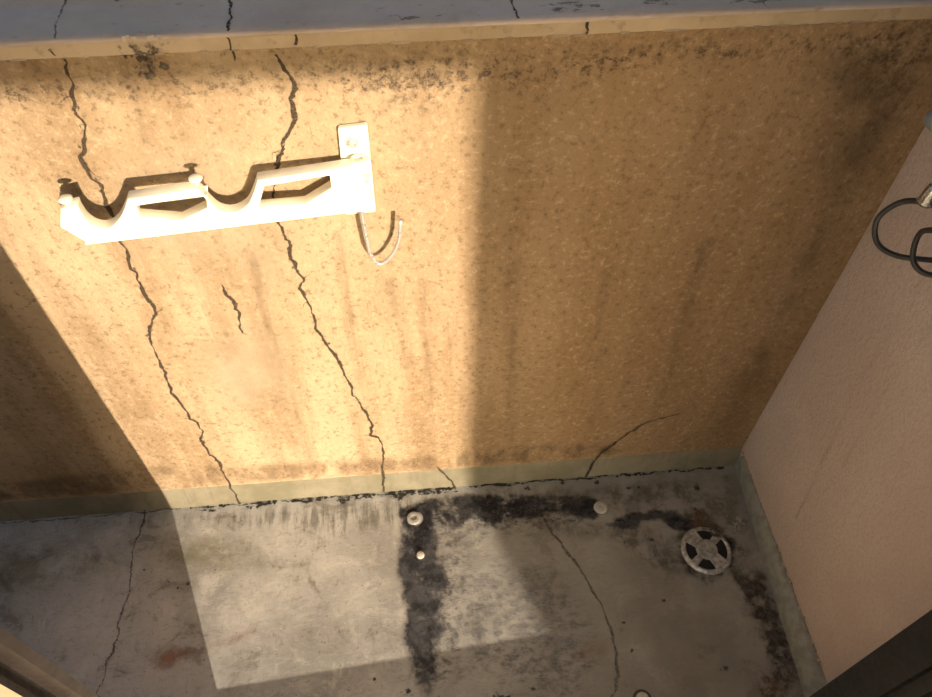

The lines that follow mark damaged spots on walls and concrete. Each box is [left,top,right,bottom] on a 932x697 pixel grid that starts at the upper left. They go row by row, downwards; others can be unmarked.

crack [48,0,115,218]
crack [226,0,236,61]
crack [272,34,298,199]
crack [0,221,724,697]
leakage [387,493,599,689]
leakage [606,485,745,546]